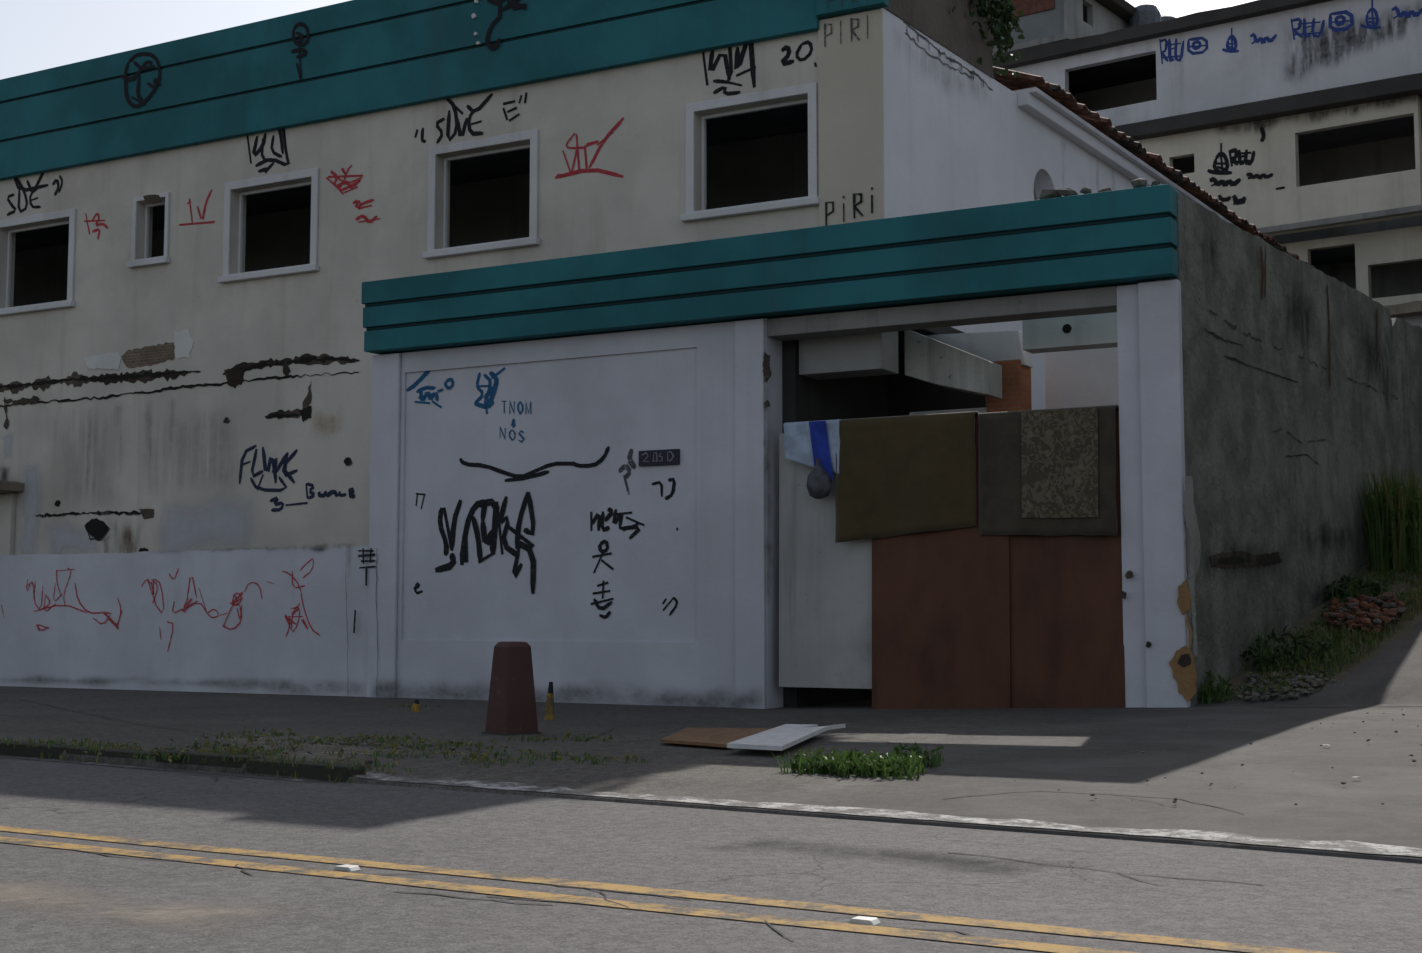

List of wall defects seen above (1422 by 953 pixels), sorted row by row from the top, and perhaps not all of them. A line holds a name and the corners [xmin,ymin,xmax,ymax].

damp [1292,16,1407,73]
spalling [0,328,360,429]
peeling [1169,476,1282,702]